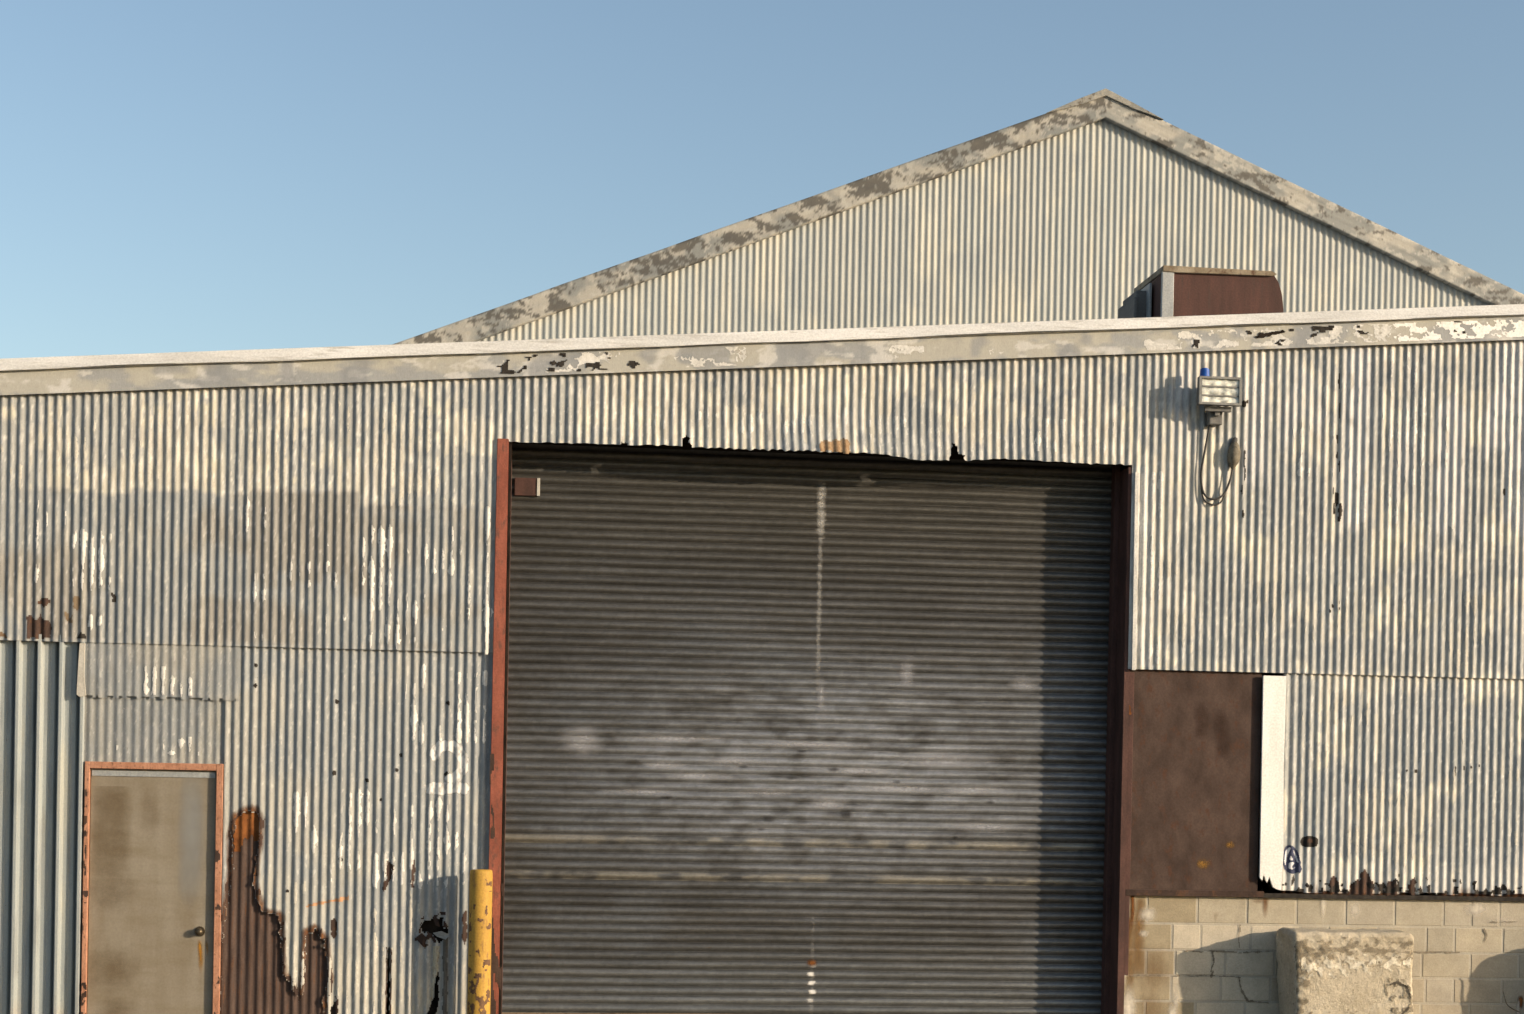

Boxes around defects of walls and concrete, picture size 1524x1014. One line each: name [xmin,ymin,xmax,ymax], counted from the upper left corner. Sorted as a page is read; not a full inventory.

peeling [545,352,620,373]
peeling [674,346,747,367]
peeling [885,345,924,359]
peeling [1144,319,1524,530]
peeling [1136,466,1201,664]
corrosion [26,596,86,639]
peeling [1255,581,1355,646]
peeling [1449,591,1491,676]
corrosion [214,802,349,1014]
corrosion [382,861,394,892]
corrosion [1329,869,1417,896]
crack [1390,921,1518,1014]